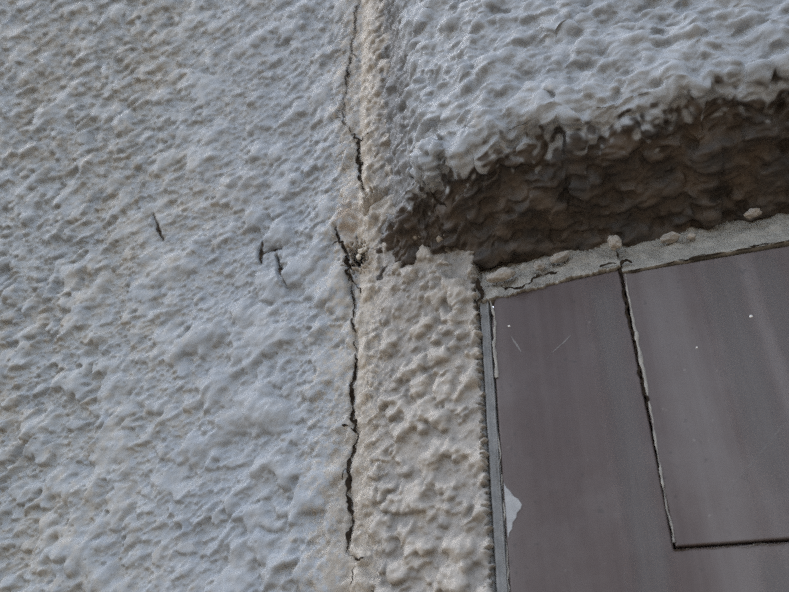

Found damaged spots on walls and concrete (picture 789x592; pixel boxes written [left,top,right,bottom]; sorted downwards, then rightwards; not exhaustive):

crack [335,3,368,192]
crack [332,227,364,585]